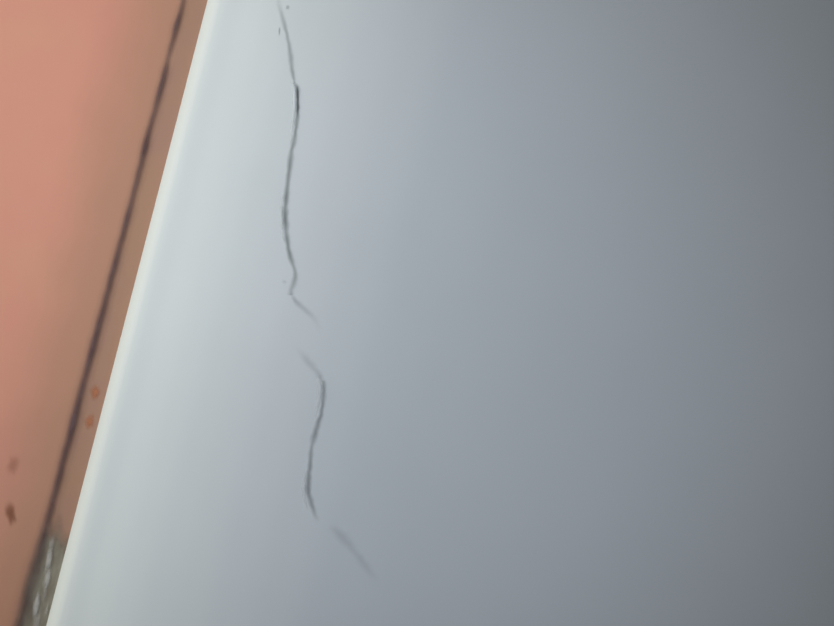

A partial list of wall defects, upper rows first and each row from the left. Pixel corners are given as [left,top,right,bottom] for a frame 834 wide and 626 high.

crack [292,84,300,118]